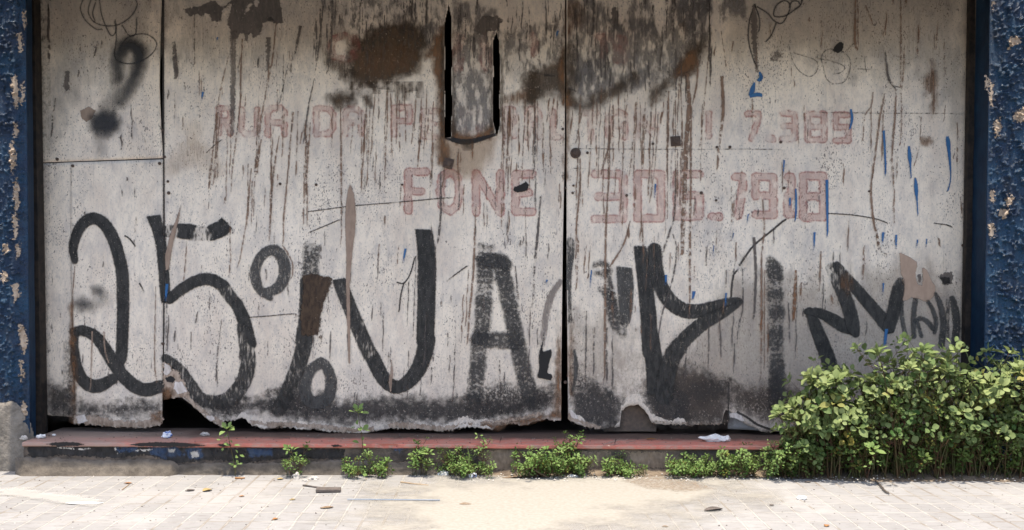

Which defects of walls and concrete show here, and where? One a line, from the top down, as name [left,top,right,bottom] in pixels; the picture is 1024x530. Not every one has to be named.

peeling [16,9,28,53]
peeling [10,75,26,109]
peeling [984,75,994,106]
peeling [992,107,1024,139]
peeling [2,122,22,259]
peeling [987,190,1015,238]
peeling [0,270,22,304]
peeling [18,324,28,382]
damp [371,308,421,394]
spalling [73,362,226,430]
peeling [0,400,374,471]
spalling [389,409,601,431]